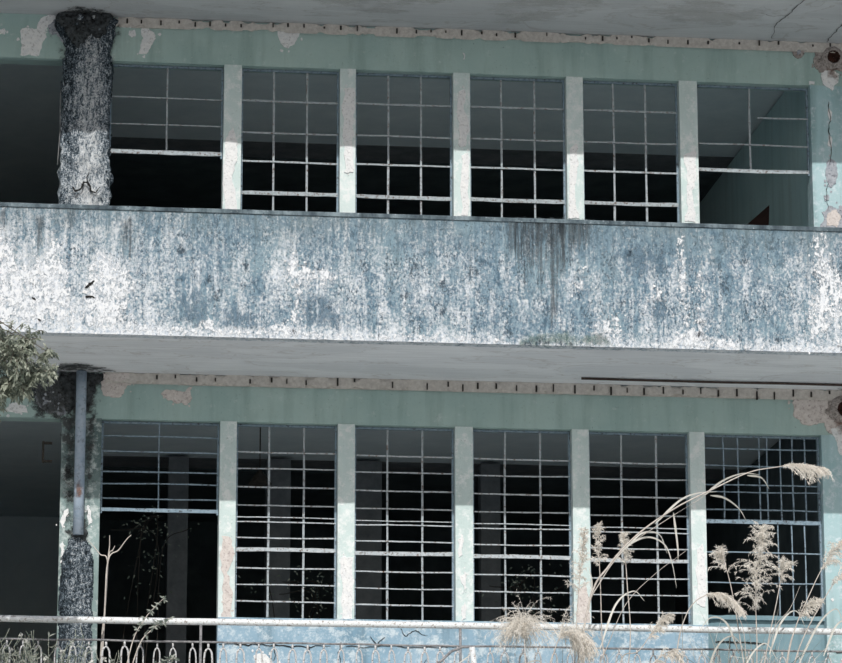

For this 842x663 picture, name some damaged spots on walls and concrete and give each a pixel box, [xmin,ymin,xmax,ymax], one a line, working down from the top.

spalling [16,6,161,60]
peeling [277,31,303,53]
spalling [809,25,842,91]
crack [824,104,838,208]
leakage [509,222,590,320]
peeling [614,202,842,354]
peeling [583,307,626,348]
spalling [5,363,134,419]
spalling [788,396,842,455]